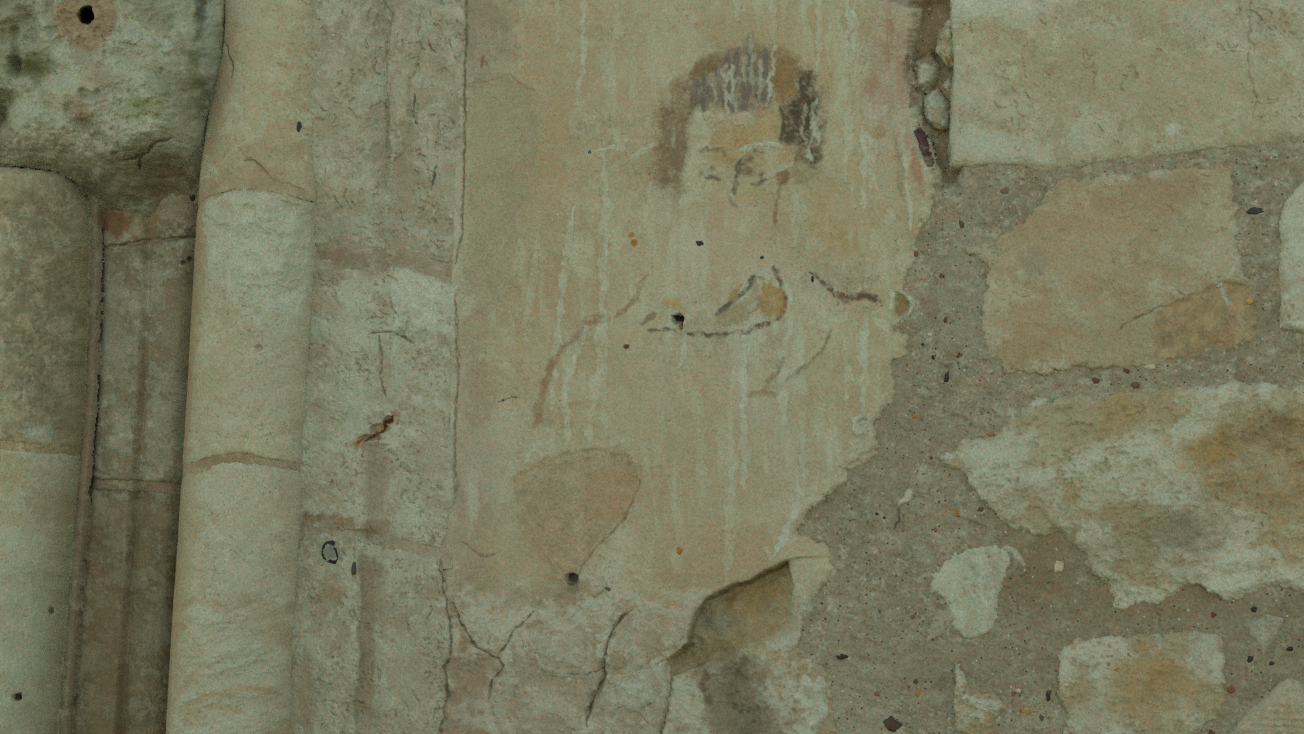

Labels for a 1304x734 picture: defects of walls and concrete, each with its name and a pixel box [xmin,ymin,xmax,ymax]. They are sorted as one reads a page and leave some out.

damp [711,0,825,116]
damp [798,96,821,163]
damp [839,93,880,210]
damp [525,143,653,446]
damp [814,291,916,415]
efflorescence [691,322,753,590]
damp [763,280,809,561]
crack [438,541,535,731]
crack [585,609,633,728]
crack [659,682,672,734]
flaking render [662,554,800,734]